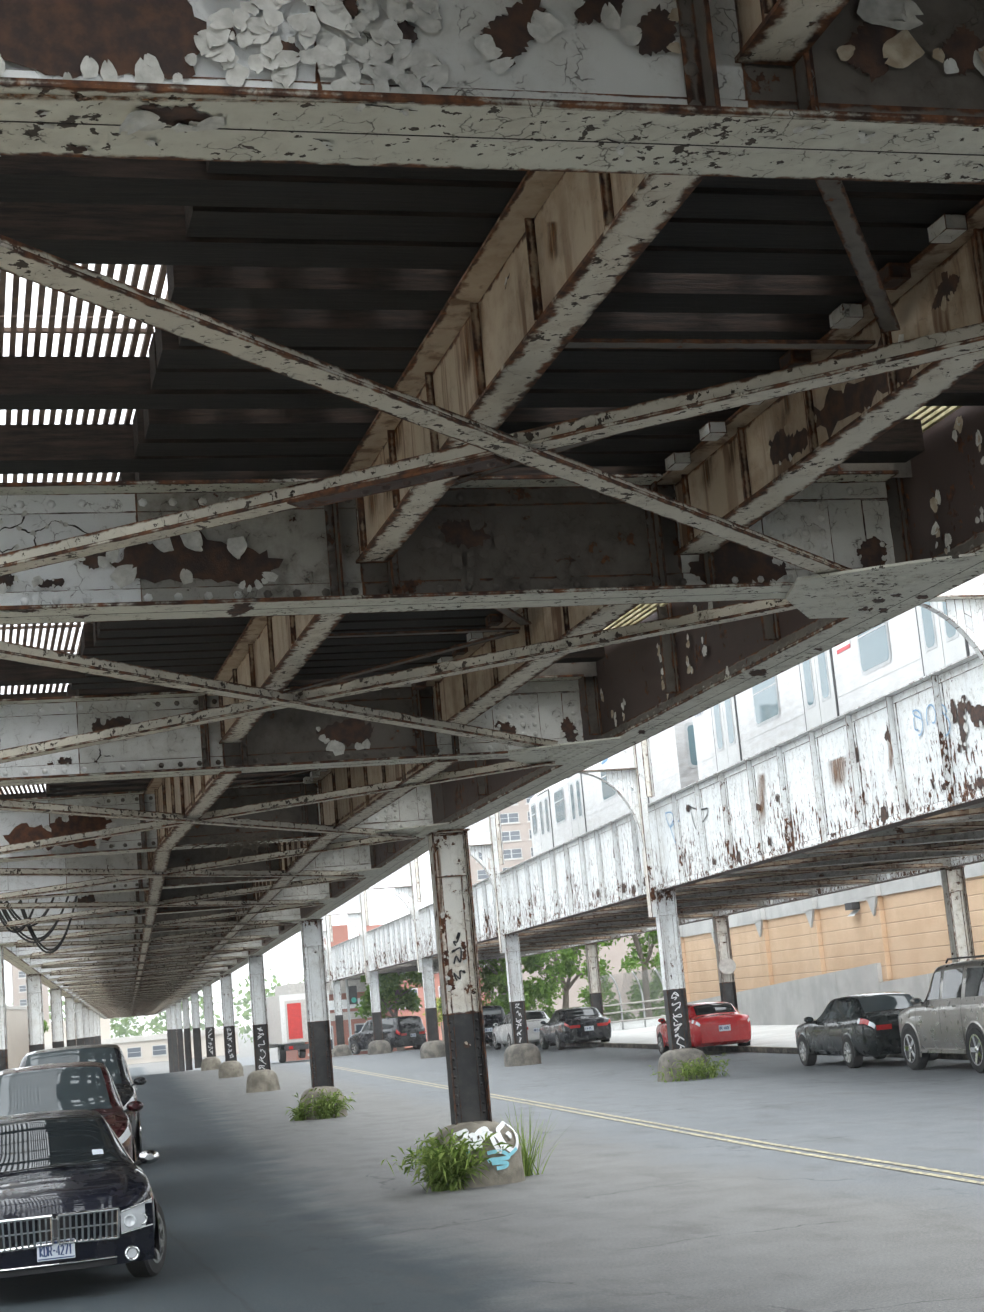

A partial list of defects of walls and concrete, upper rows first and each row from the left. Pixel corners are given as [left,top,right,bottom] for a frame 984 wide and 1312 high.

peeling [475,0,682,74]
peeling [836,0,984,83]
peeling [119,104,225,135]
rust [0,93,360,103]
peeling [765,365,920,465]
peeling [952,416,984,465]
peeling [930,489,952,554]
peeling [74,530,283,617]
peeling [688,541,793,594]
peeling [316,718,374,756]
rust [830,757,844,783]
peeling [3,814,117,851]